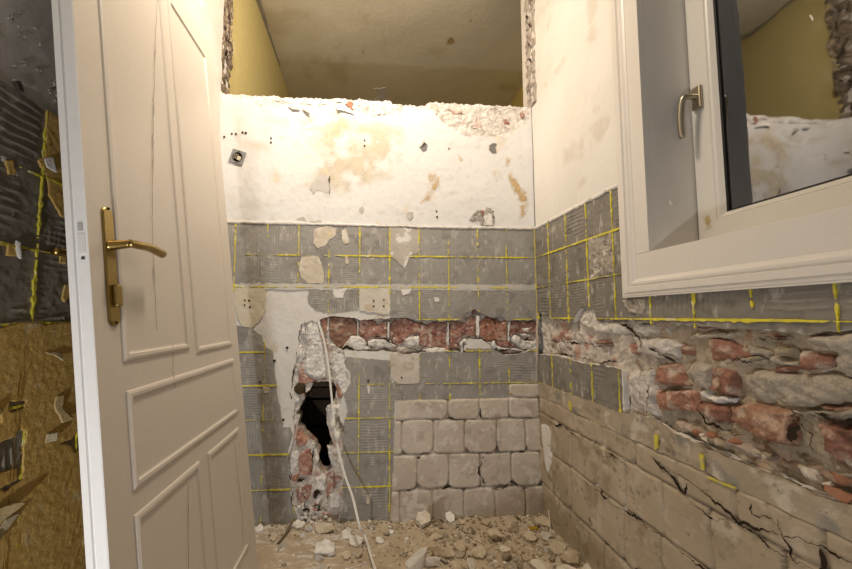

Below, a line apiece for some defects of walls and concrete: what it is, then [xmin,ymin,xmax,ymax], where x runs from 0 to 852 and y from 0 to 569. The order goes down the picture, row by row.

spalling [221,0,537,138]
peeling [44,157,58,173]
peeling [14,240,22,259]
peeling [299,226,350,284]
peeling [390,227,419,269]
peeling [588,233,615,280]
peeling [45,394,76,443]
crack [424,409,580,442]
spalling [319,288,852,504]
peeling [0,501,26,539]
crack [578,475,705,569]
crack [652,456,850,569]